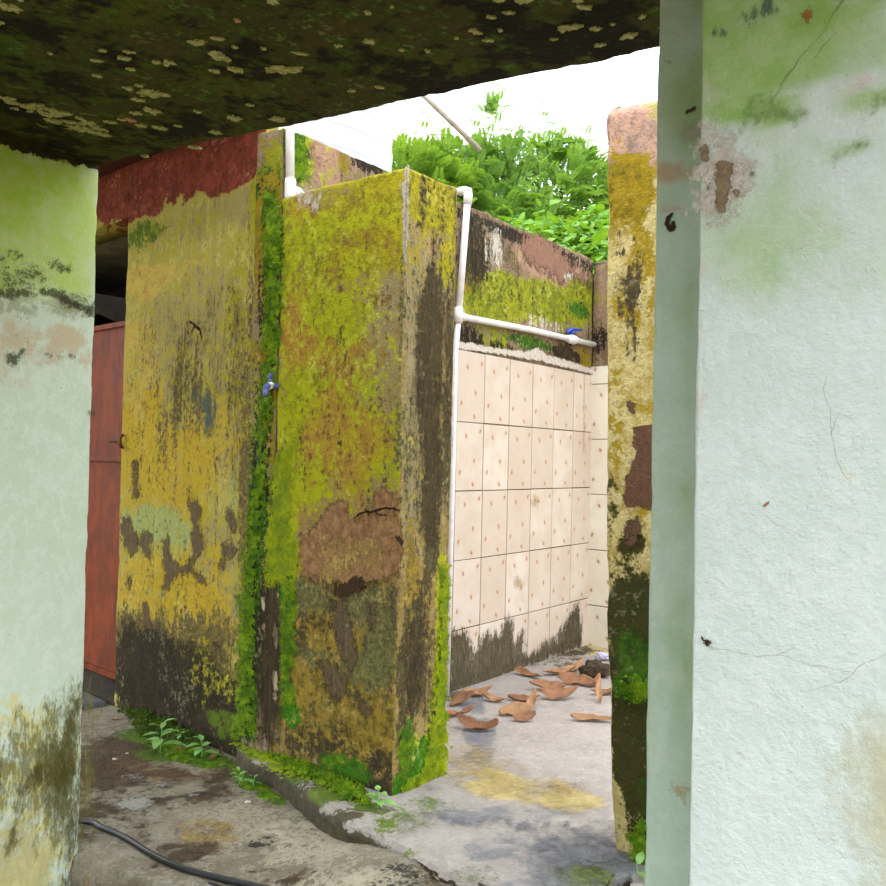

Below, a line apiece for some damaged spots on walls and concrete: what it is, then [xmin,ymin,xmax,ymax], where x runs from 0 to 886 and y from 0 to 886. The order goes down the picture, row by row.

peeling [664,212,676,232]
peeling [687,123,756,226]
leakage [0,250,98,317]
leakage [412,267,453,548]
peeling [621,425,652,548]
flaking render [296,484,404,718]
leakage [450,601,583,692]
leakage [0,680,102,886]
crack [414,859,486,886]